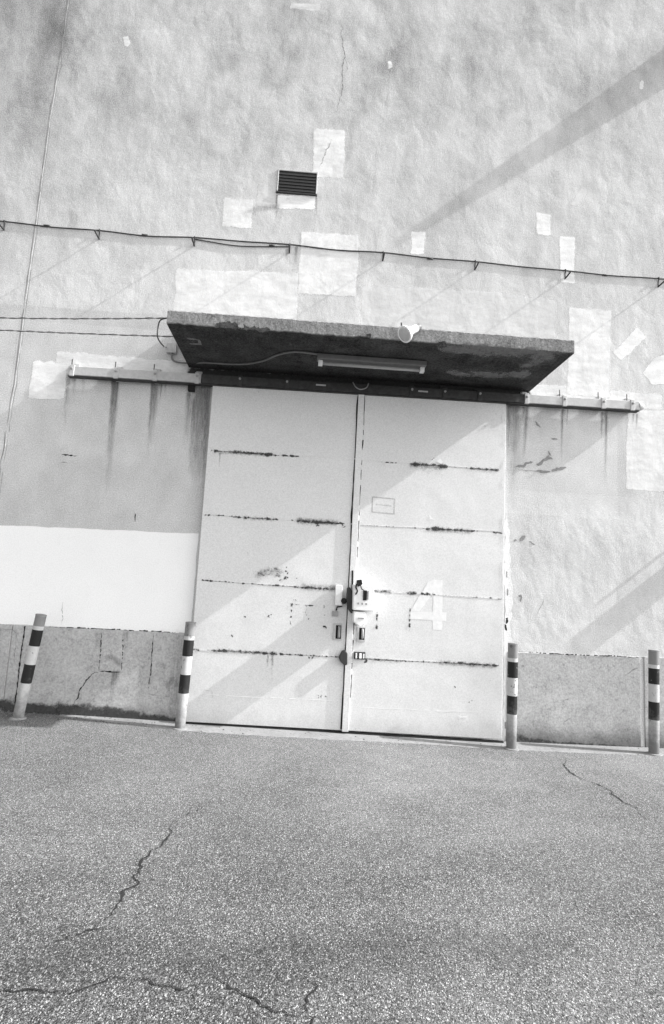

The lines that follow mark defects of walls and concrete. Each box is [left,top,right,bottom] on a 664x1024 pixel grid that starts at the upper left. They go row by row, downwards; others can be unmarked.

crack [337,28,348,107]
corrosion [211,449,299,457]
corrosion [411,459,498,471]
corrosion [292,518,345,528]
corrosion [202,567,333,590]
crack [60,603,173,703]
corrosion [212,649,337,659]
crack [563,758,647,820]
crack [57,807,203,941]
crack [1,976,318,1024]